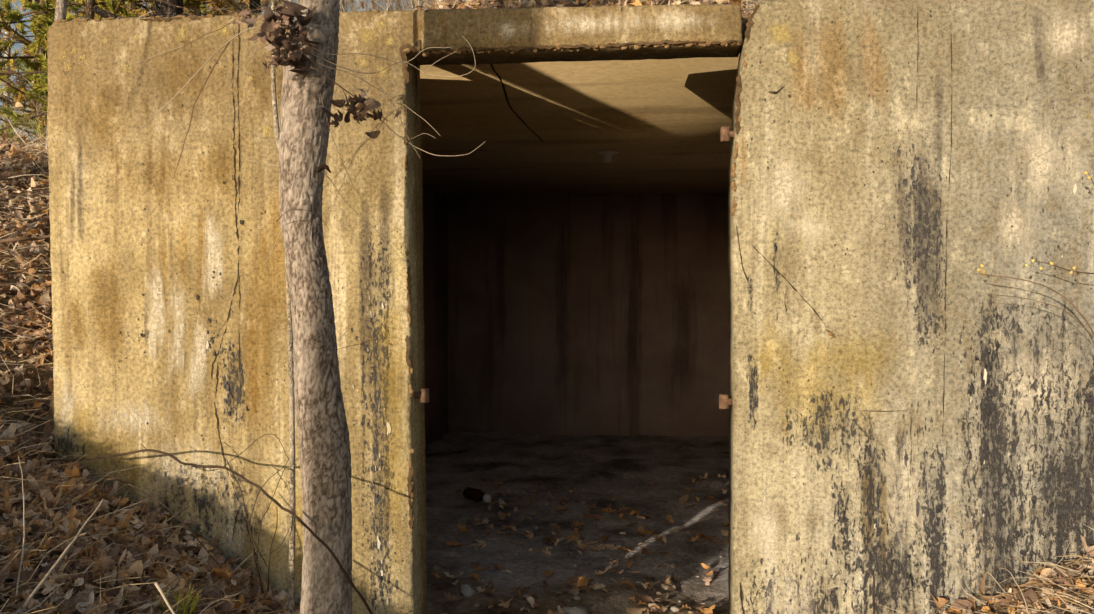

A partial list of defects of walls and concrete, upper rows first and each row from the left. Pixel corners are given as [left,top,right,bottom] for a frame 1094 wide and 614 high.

crack [211,22,262,574]
leakage [1004,356,1074,427]
leakage [157,449,220,492]
leakage [889,434,917,519]
leakage [1051,525,1086,555]
leakage [774,578,809,614]